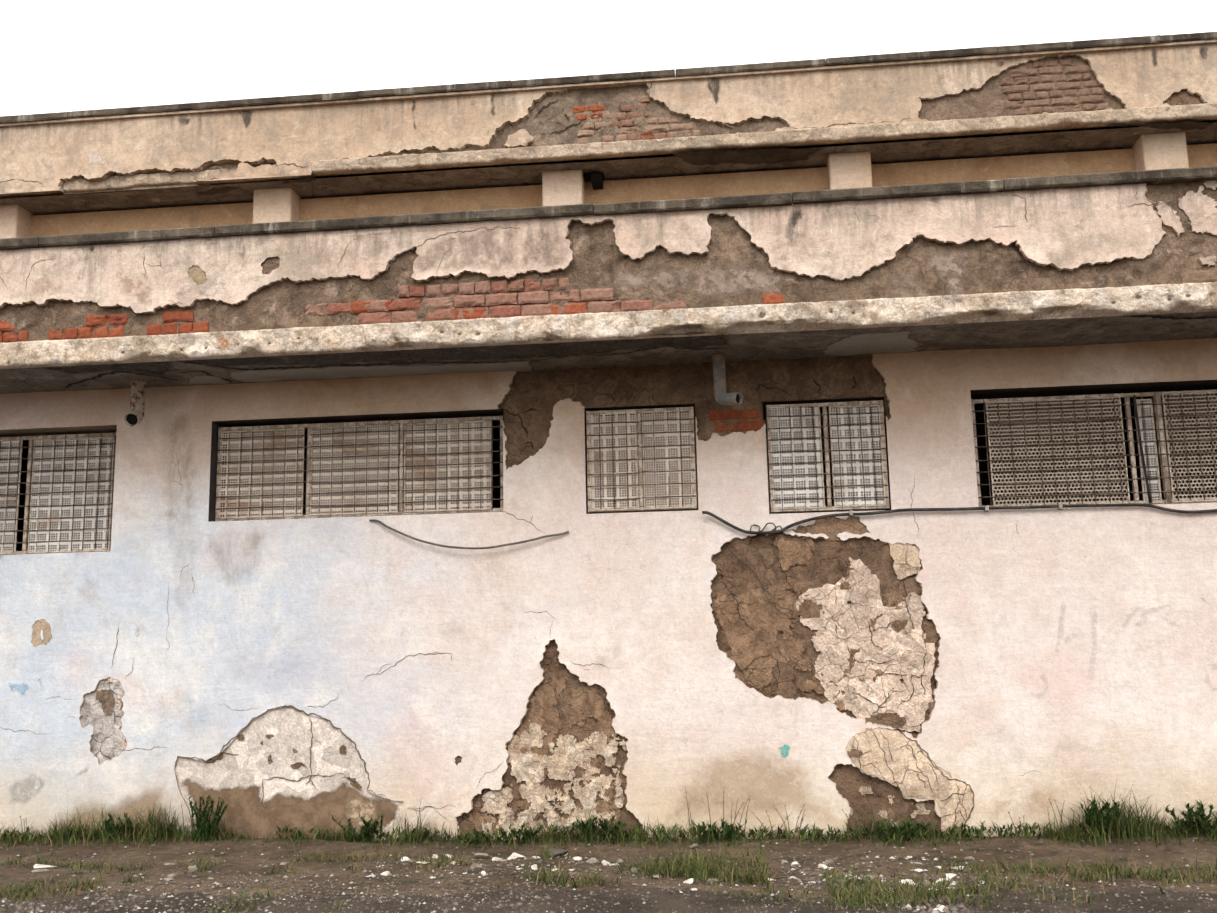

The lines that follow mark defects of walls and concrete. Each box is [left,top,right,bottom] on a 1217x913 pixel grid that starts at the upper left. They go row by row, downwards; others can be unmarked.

flaking render [365,85,822,165]
flaking render [918,54,1213,130]
flaking render [58,154,278,195]
flaking render [0,180,1217,471]
peeling [31,619,52,647]
flaking render [710,516,941,739]
crack [307,652,452,708]
flaking render [79,677,127,765]
flaking render [174,705,404,841]
flaking render [455,639,645,840]
flaking render [828,763,941,837]